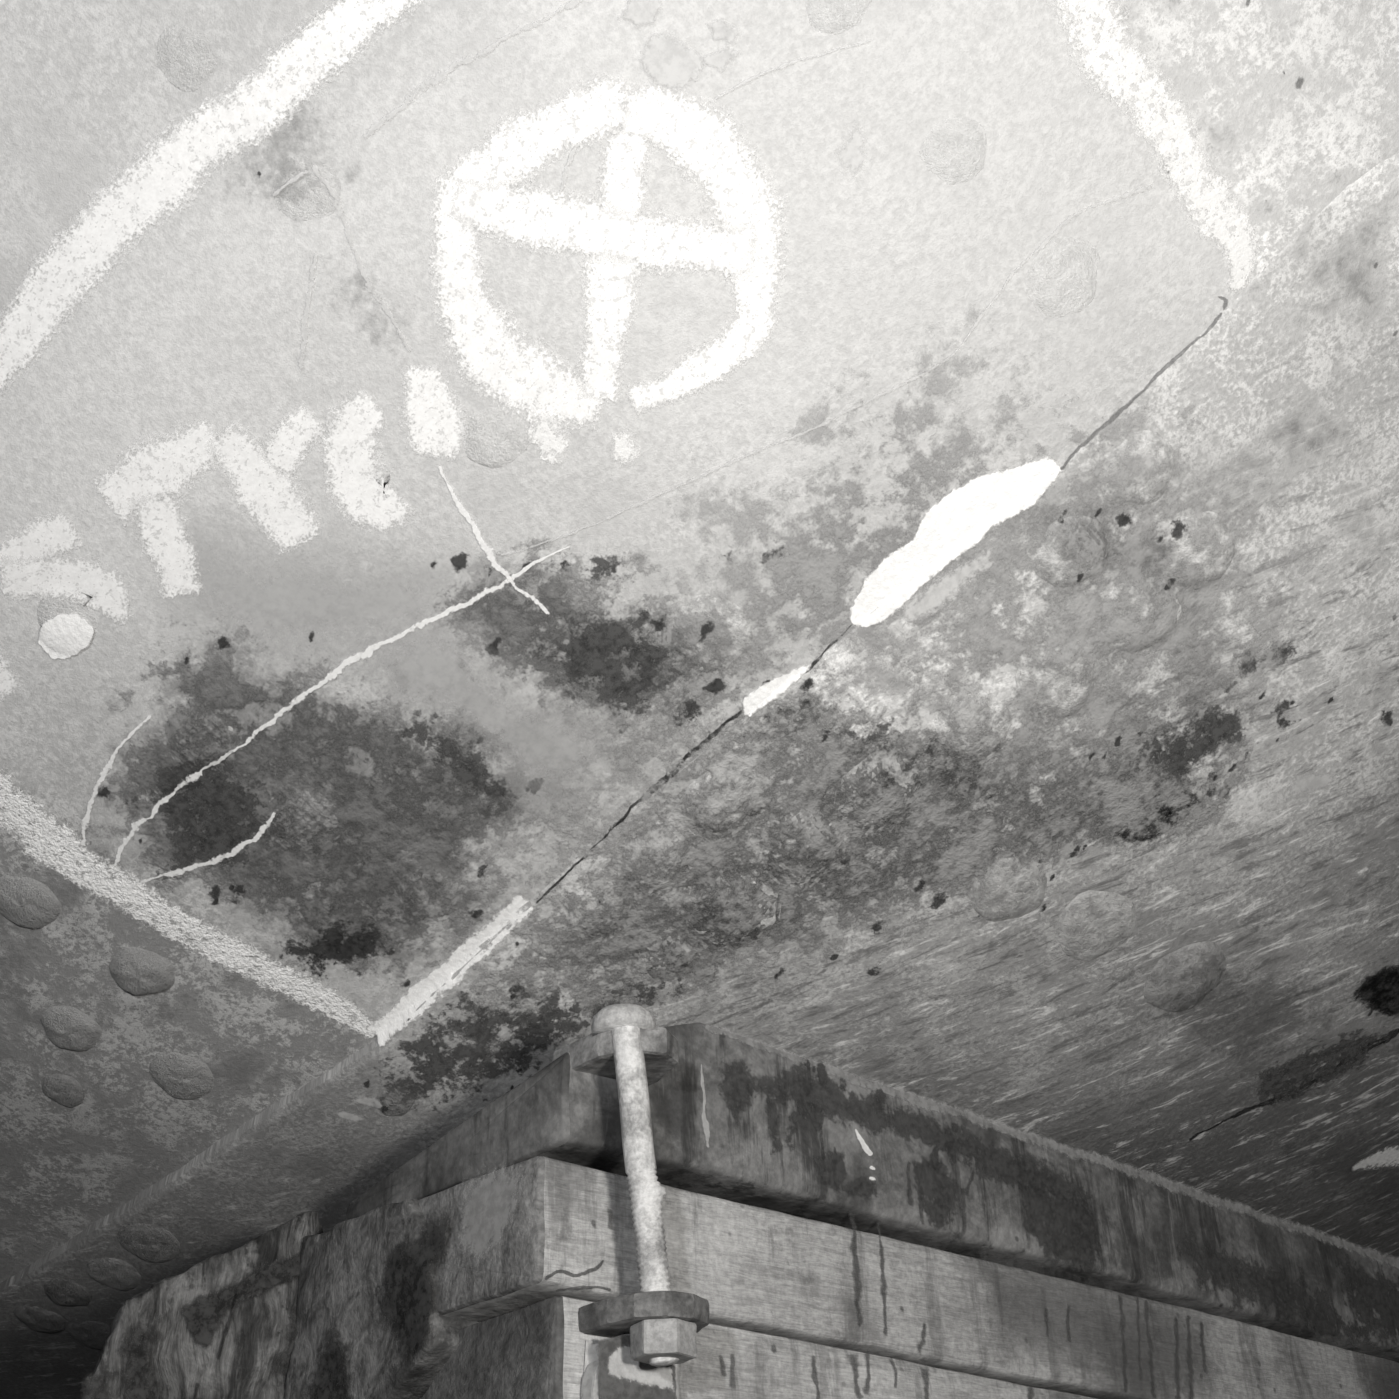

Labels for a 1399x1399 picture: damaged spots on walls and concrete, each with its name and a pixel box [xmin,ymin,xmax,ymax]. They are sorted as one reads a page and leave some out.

leakage [1095,508,1132,527]
leakage [1159,520,1187,542]
crack [806,625,851,673]
crack [536,711,742,903]
crack [1189,1029,1399,1141]